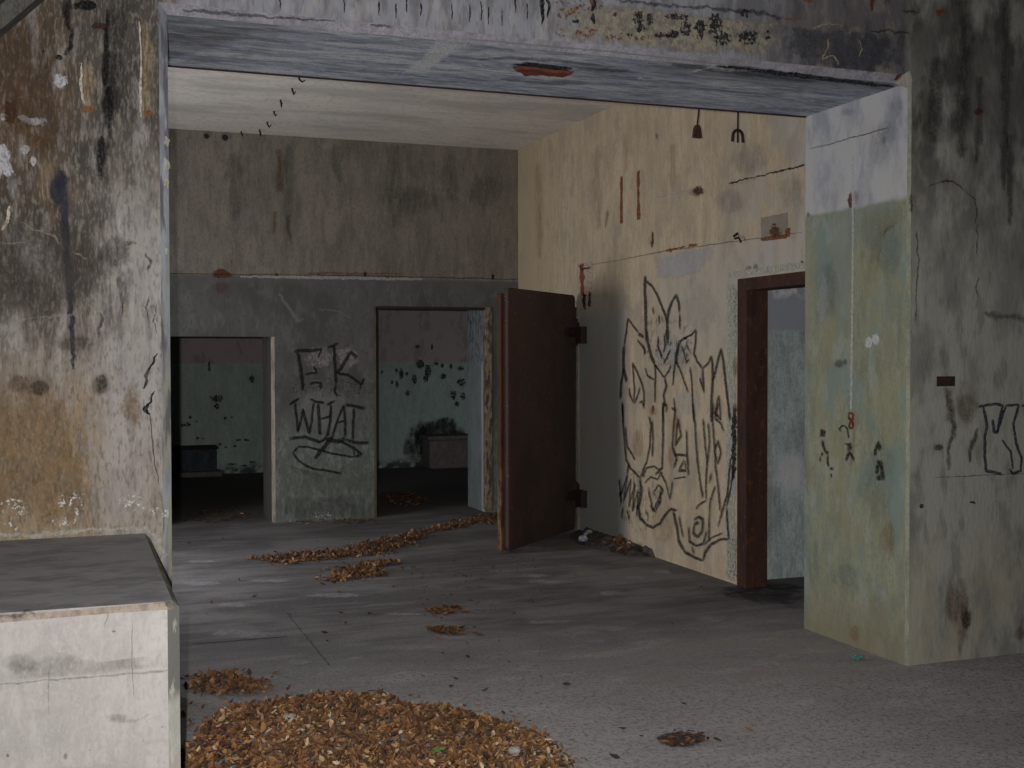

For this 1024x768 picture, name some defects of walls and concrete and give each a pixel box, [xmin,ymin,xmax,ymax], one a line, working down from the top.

damp [96,14,114,176]
crack [729,164,805,186]
damp [51,171,75,369]
crack [142,353,159,482]